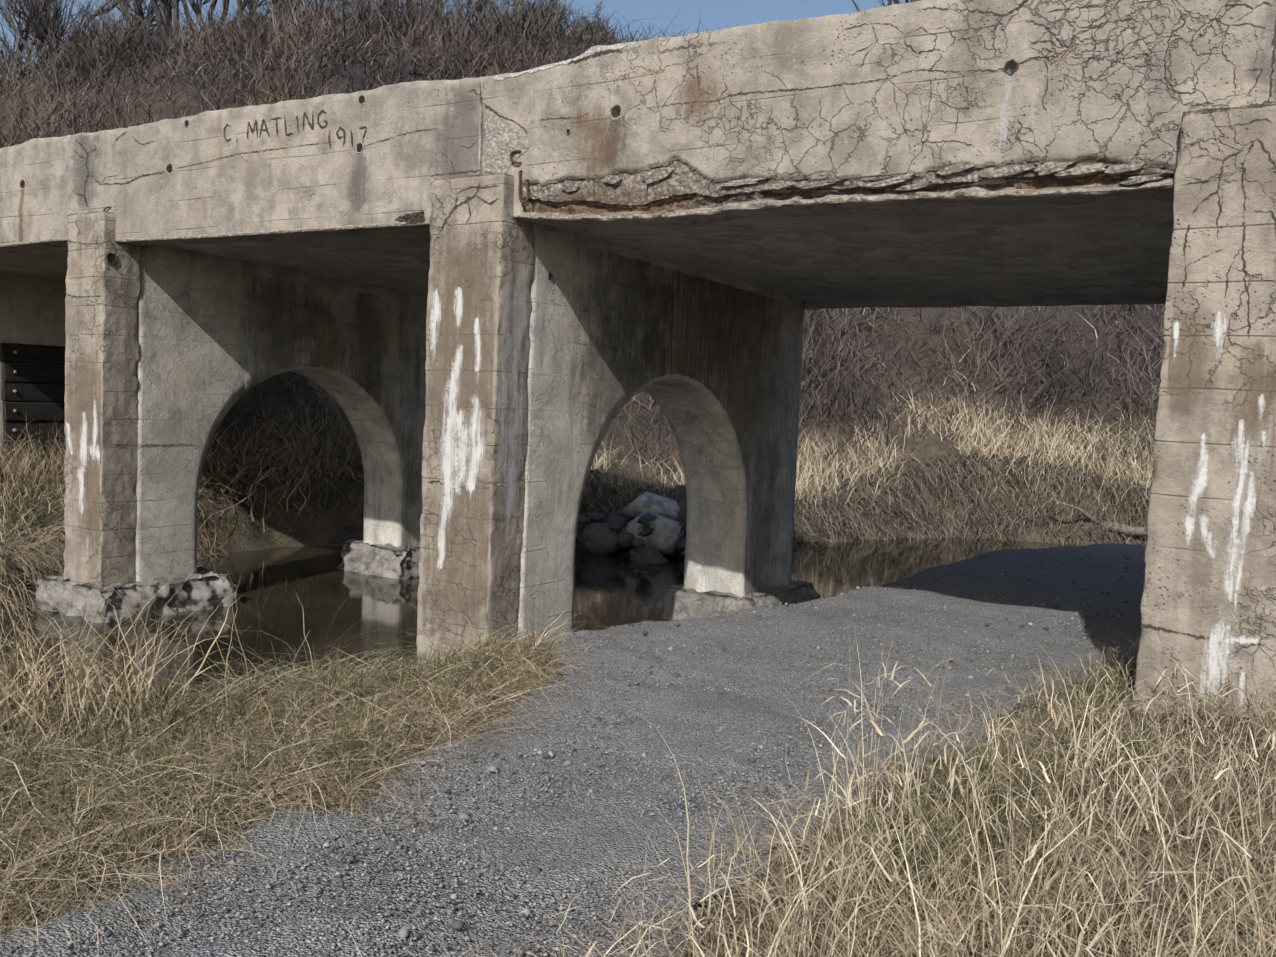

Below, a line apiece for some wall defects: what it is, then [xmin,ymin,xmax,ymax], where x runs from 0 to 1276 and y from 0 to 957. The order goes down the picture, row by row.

crack [568,41,735,64]
crack [67,131,329,245]
crack [366,82,588,232]
spalling [483,110,531,173]
spalling [520,158,1174,219]
crack [647,0,1276,338]
water stain [66,401,100,513]
water stain [430,265,547,571]
water stain [1183,394,1266,706]
crack [1142,624,1265,645]